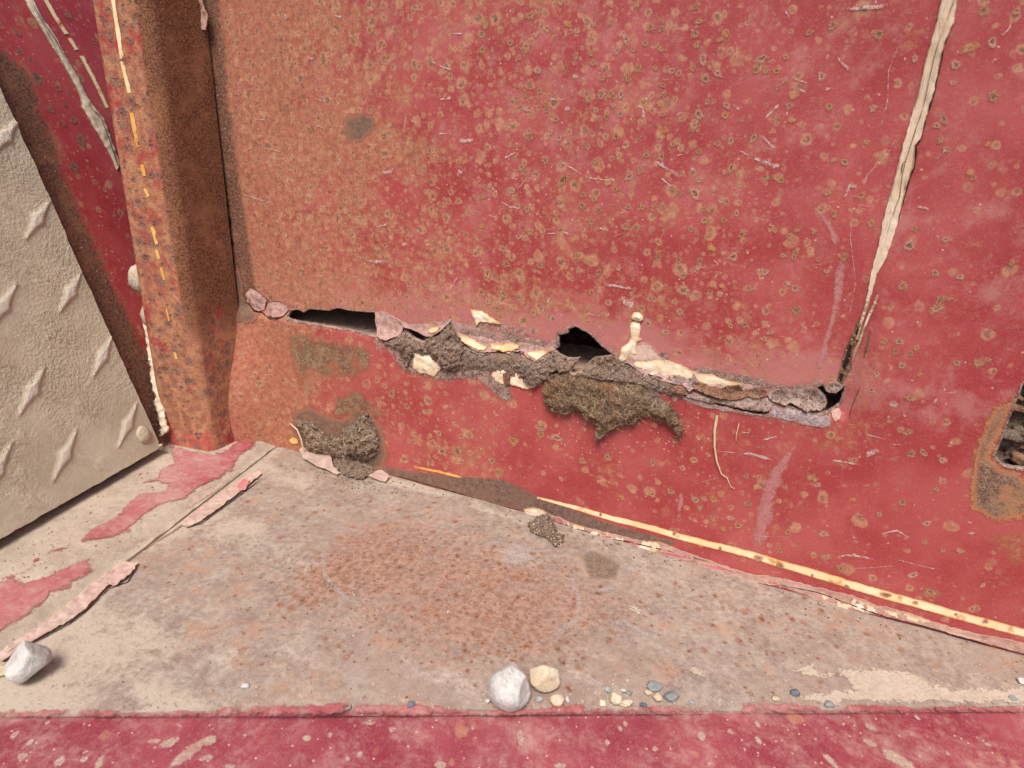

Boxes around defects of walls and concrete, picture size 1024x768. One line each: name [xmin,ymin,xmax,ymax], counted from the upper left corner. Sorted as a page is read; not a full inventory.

crack [888,30,951,230]
peeling [82,441,262,542]
peeling [245,288,289,317]
peeling [413,353,441,377]
corrosion [292,406,676,546]
peeling [471,310,501,325]
peeling [459,334,552,361]
peeling [491,368,533,389]
peeling [682,397,842,428]
crack [838,319,870,422]
corrosion [969,385,1024,523]
peeling [0,559,139,662]